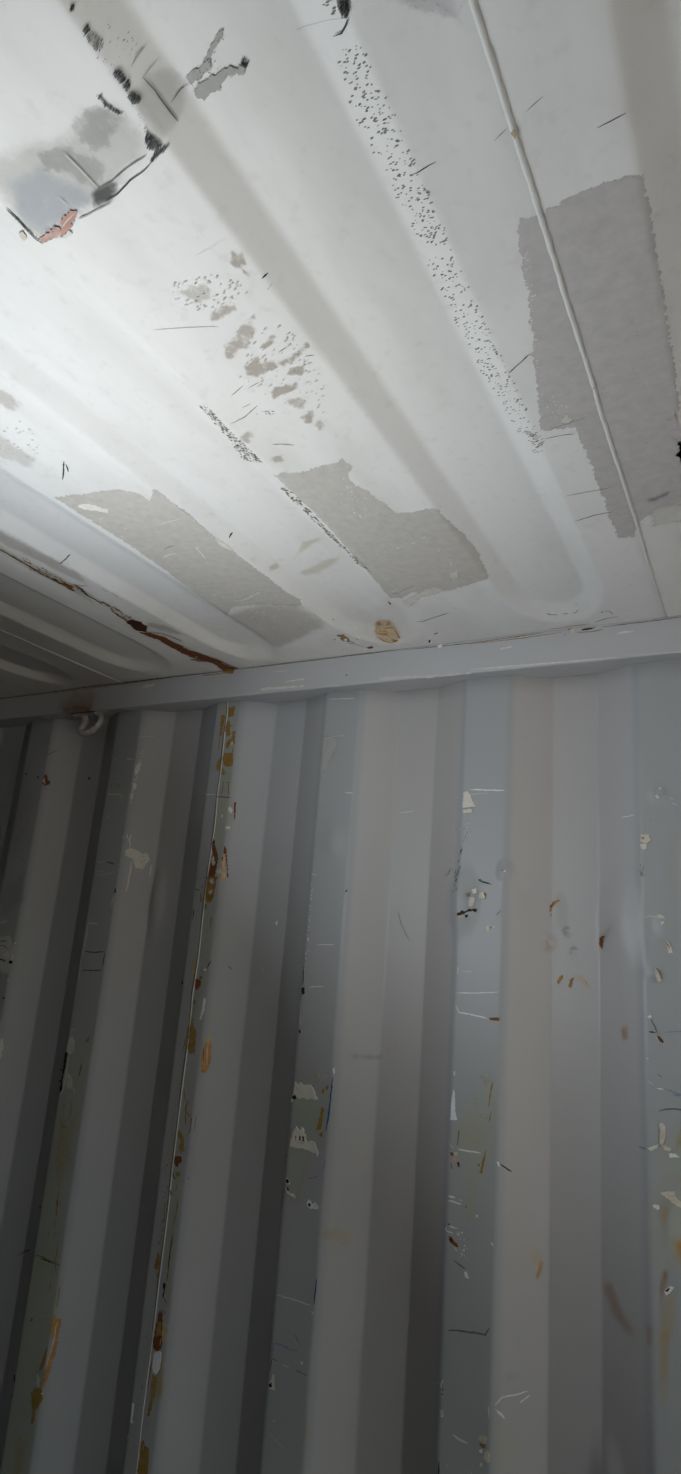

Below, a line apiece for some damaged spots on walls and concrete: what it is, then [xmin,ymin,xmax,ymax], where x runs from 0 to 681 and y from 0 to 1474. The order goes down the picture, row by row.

peeling [77,504,109,513]
rust [0,549,238,676]
rust [312,602,400,649]
rust [205,706,236,798]
rust [192,840,229,932]
rust [181,956,212,1073]
peeling [291,1082,318,1102]
peeling [290,1126,319,1157]
rust [146,1087,197,1417]
rust [28,1284,62,1424]
rust [137,1440,149,1474]